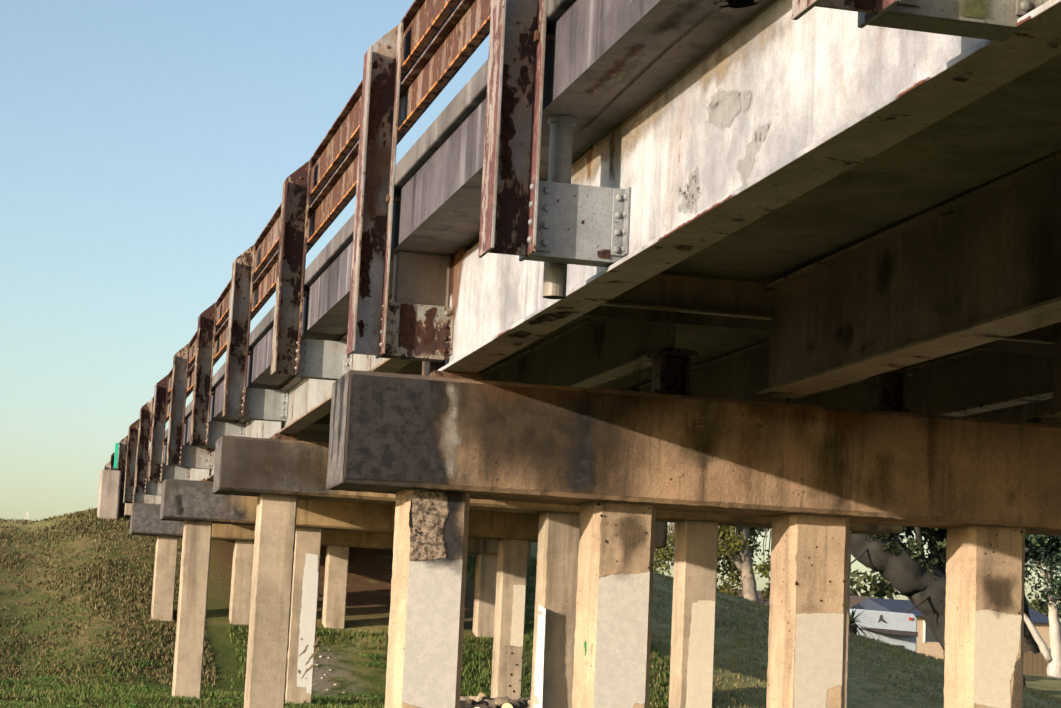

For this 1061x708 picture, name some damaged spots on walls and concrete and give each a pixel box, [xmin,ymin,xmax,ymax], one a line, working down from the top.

spalling [714,0,765,12]
corrosion [853,0,876,11]
corrosion [500,63,526,180]
corrosion [359,127,390,299]
corrosion [398,303,437,350]
damp [130,371,654,566]
spalling [409,490,449,561]
damp [985,579,1021,614]